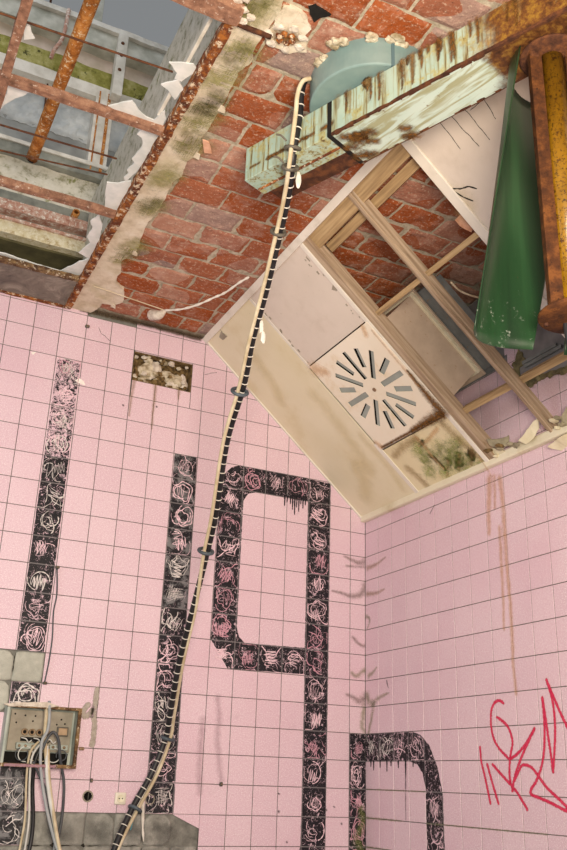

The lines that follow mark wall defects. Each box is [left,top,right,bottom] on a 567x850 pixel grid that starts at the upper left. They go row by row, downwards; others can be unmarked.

flaking render [72,0,331,313]